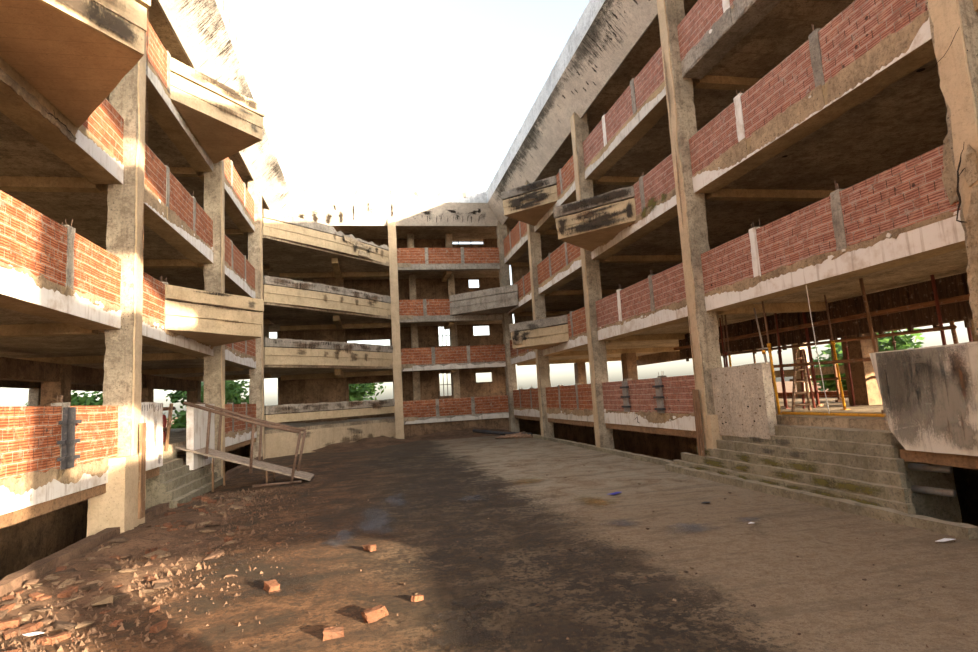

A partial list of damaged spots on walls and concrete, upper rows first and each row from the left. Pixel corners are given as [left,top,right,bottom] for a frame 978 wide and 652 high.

damp [55,0,137,42]
damp [177,0,288,208]
damp [493,0,626,210]
damp [298,190,375,224]
damp [413,209,485,223]
damp [557,188,666,235]
spalling [706,145,978,335]
peeling [0,261,119,312]
damp [875,345,977,449]
peeling [0,457,109,495]